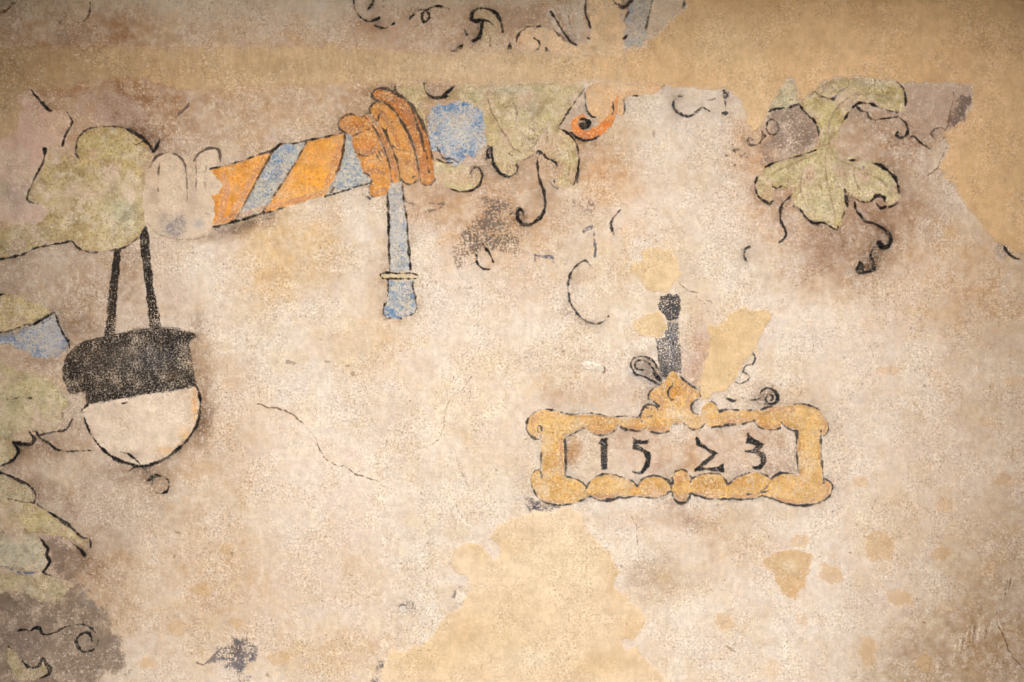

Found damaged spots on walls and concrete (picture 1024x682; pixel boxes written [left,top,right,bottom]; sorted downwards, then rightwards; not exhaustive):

crack [257,403,303,423]
crack [317,443,377,481]
spalling [764,550,812,600]